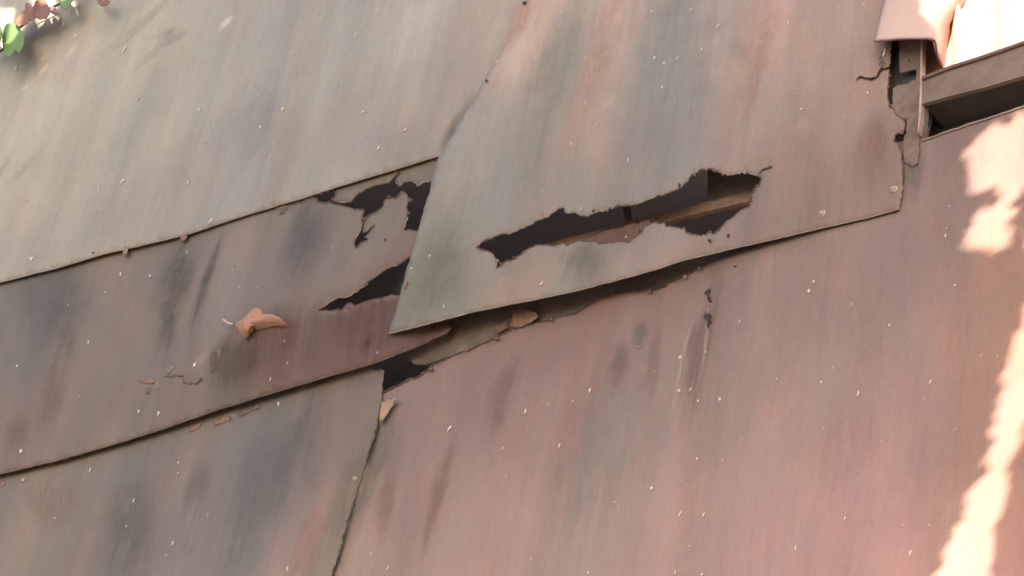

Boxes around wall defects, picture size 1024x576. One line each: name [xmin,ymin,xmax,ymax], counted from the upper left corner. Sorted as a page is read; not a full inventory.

crack [856,60,890,80]
rust [493,307,539,334]
hole [703,288,712,328]